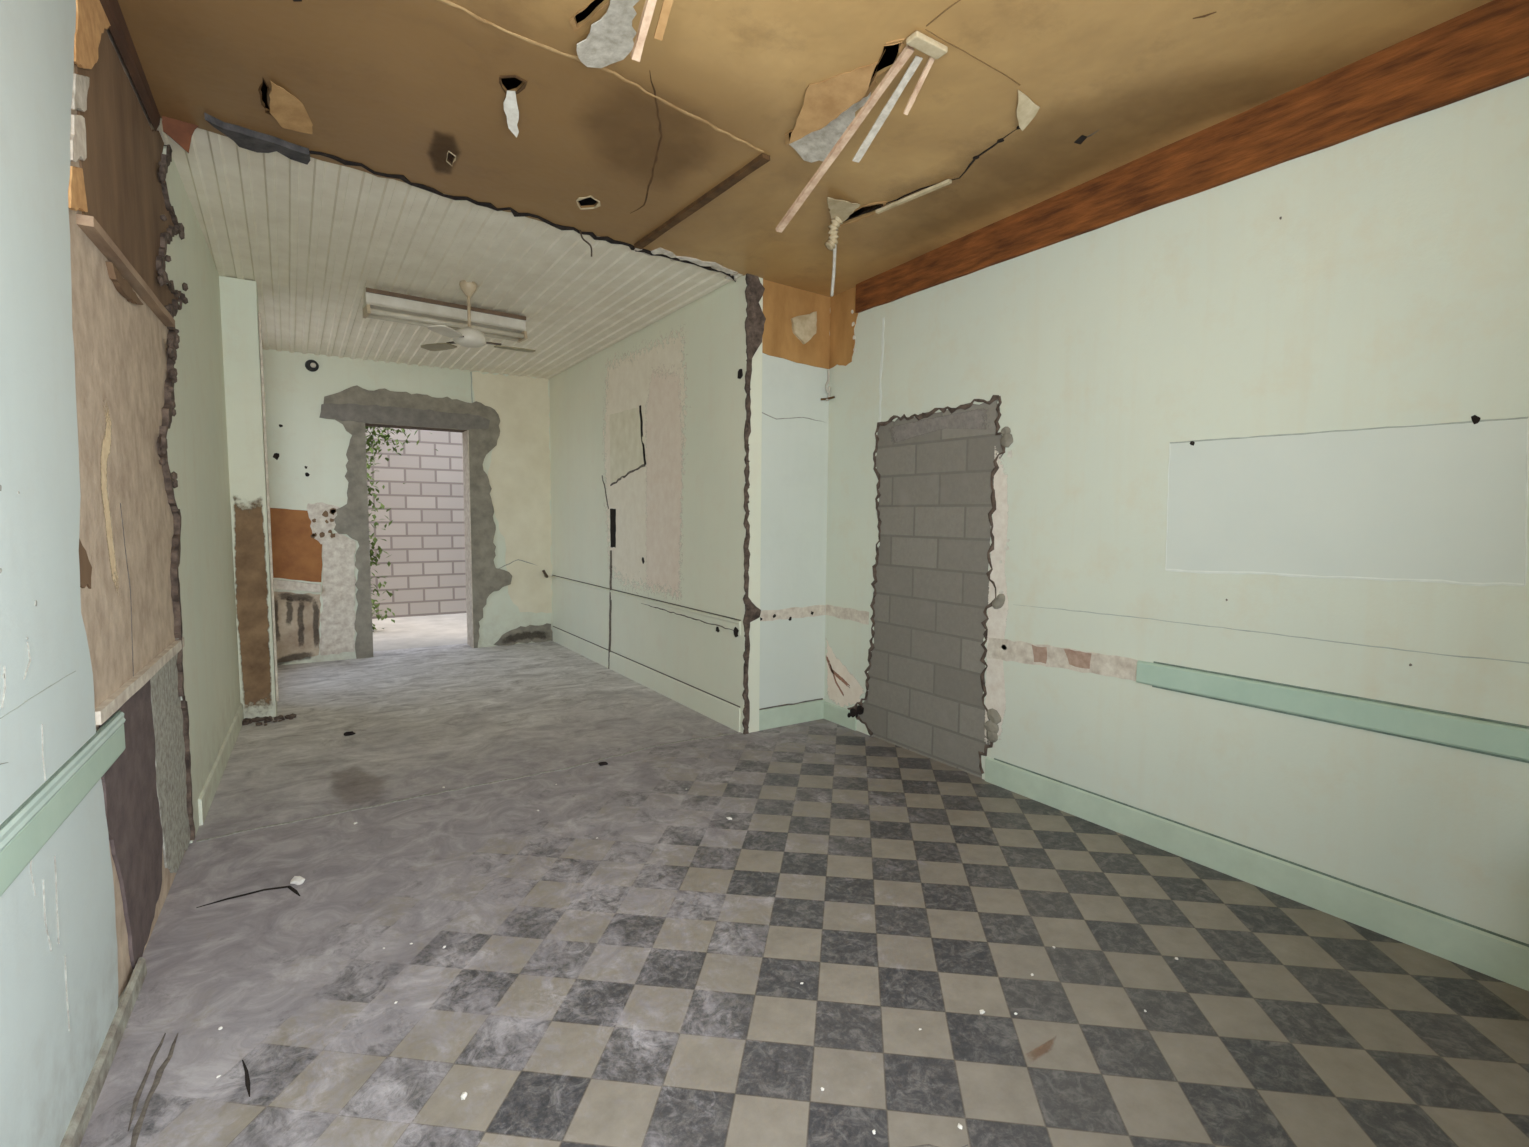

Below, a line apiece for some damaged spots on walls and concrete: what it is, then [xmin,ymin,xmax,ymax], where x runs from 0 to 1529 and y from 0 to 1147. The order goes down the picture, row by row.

peeling [576,0,639,68]
flaking render [70,73,90,162]
spalling [204,81,313,165]
flaking render [79,538,92,589]
spalling [150,145,195,873]
flaking render [307,502,339,544]
peeling [634,248,1139,774]